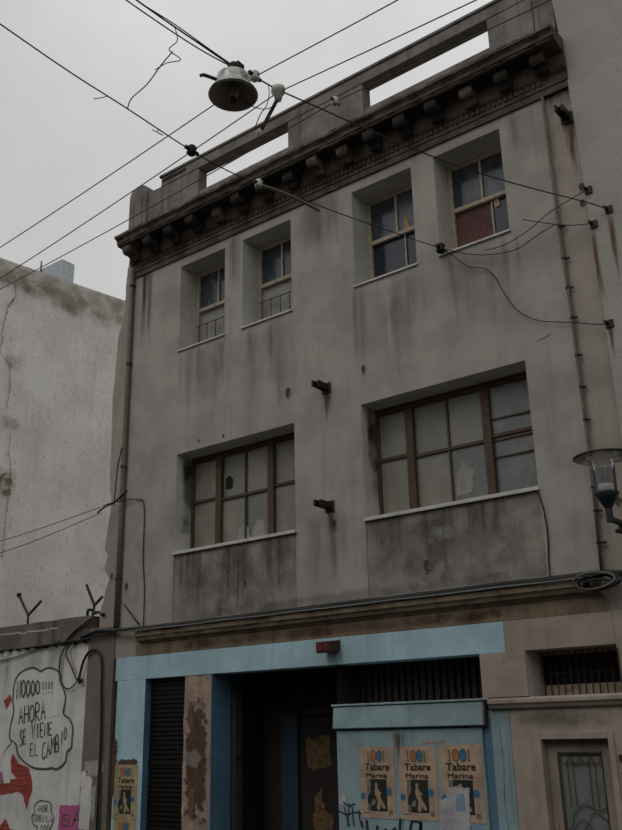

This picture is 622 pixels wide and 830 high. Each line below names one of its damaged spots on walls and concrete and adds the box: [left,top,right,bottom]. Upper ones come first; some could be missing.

damp [1,263,125,322]
spalling [0,472,12,496]
crack [2,434,11,559]
peeling [184,697,207,824]